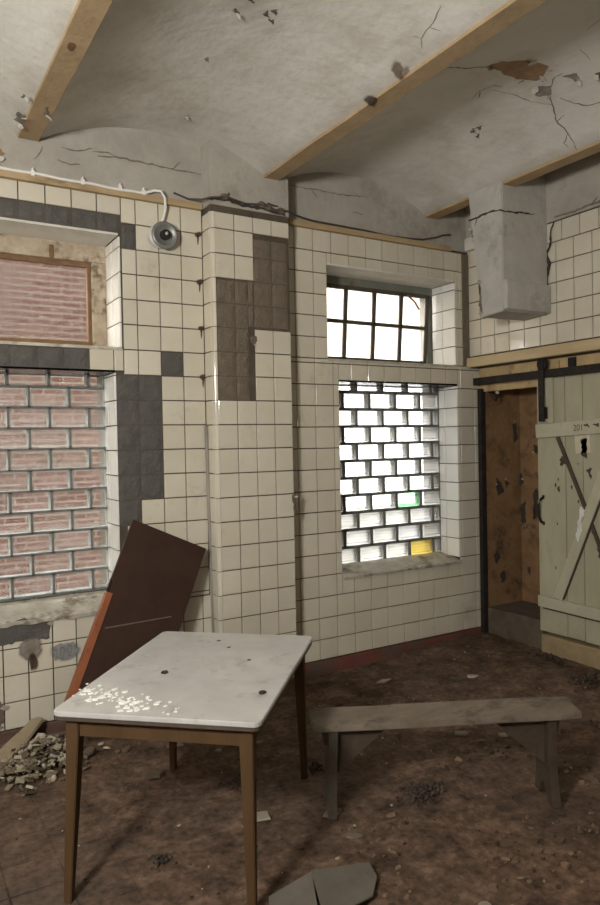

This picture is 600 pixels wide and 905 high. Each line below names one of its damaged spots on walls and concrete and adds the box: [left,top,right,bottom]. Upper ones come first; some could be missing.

flaking render [487,60,552,99]
crack [447,67,600,150]
crack [468,209,554,285]